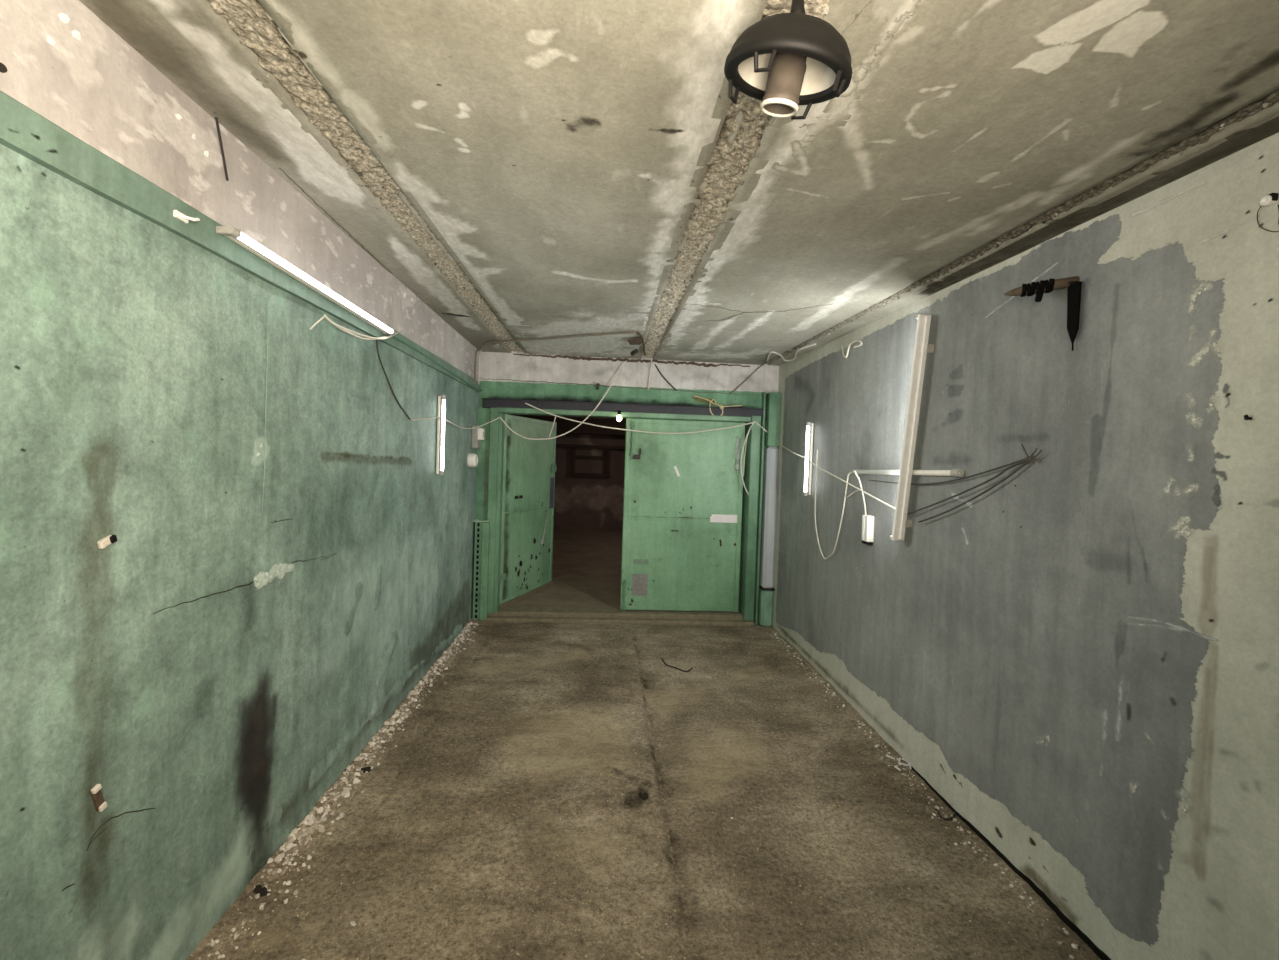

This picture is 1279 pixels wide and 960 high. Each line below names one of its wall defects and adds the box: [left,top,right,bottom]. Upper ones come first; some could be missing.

spalling [761,0,831,20]
spalling [206,0,523,353]
spalling [634,91,772,358]
peeling [1185,384,1229,427]
peeling [1164,479,1198,495]
peeling [1211,453,1230,506]
peeling [1171,516,1191,538]
flaking render [253,563,295,589]
crack [153,579,259,614]